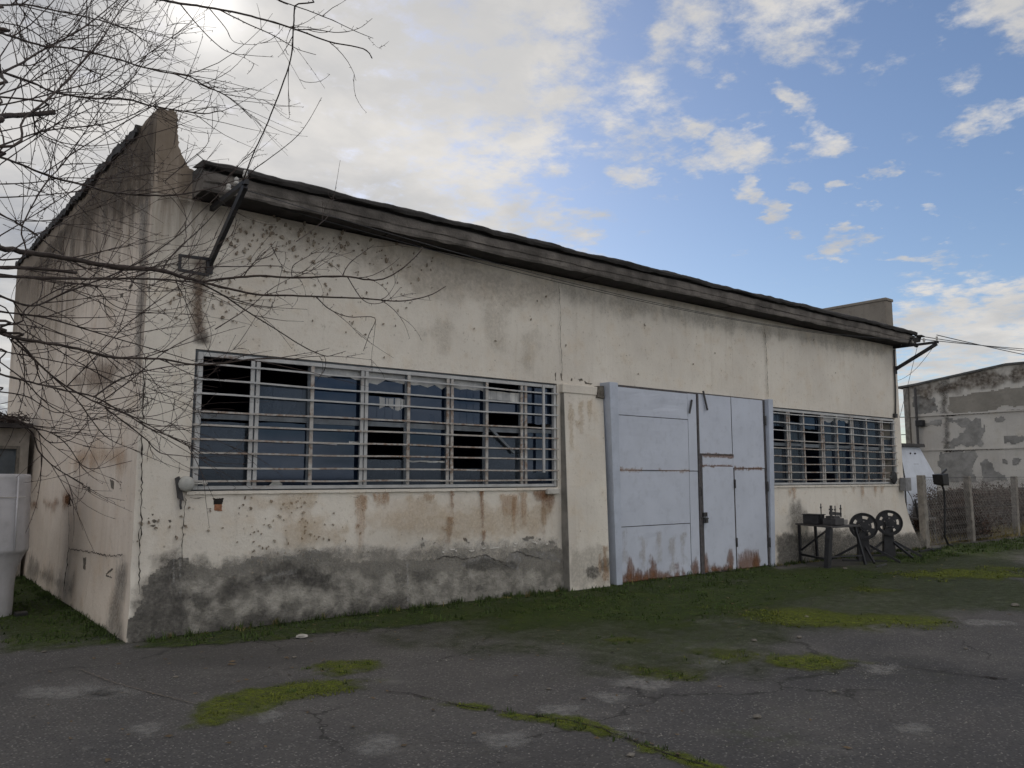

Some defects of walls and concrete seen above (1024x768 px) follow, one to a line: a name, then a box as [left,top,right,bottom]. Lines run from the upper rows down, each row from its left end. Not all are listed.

leakage [29,125,152,367]
peeling [912,386,1024,484]
leakage [109,545,563,643]
rust [622,550,761,582]